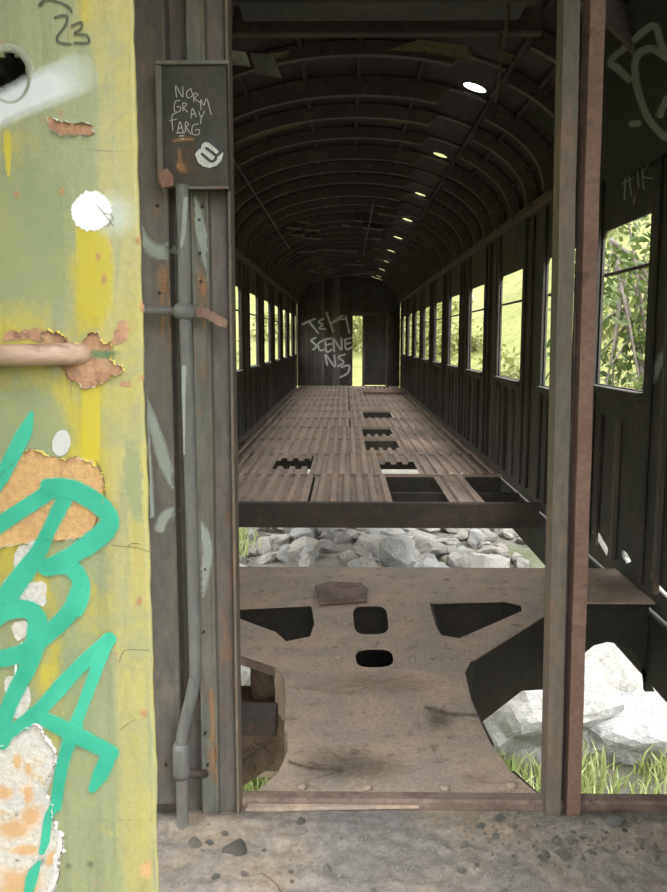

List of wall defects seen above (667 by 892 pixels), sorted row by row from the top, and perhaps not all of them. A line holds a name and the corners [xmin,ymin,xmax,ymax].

peeling [3,320,130,390]
peeling [13,686,31,719]
peeling [61,670,94,734]
peeling [69,745,91,781]
peeling [0,722,66,892]